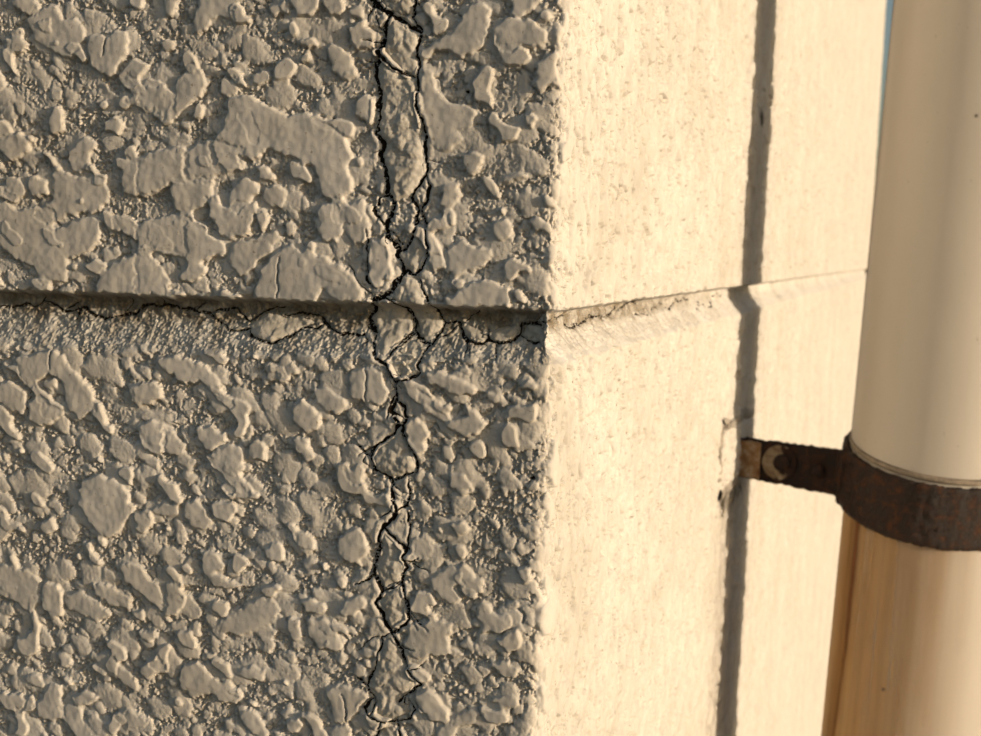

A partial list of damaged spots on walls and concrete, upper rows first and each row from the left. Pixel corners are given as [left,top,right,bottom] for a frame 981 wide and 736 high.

crack [0,0,723,736]